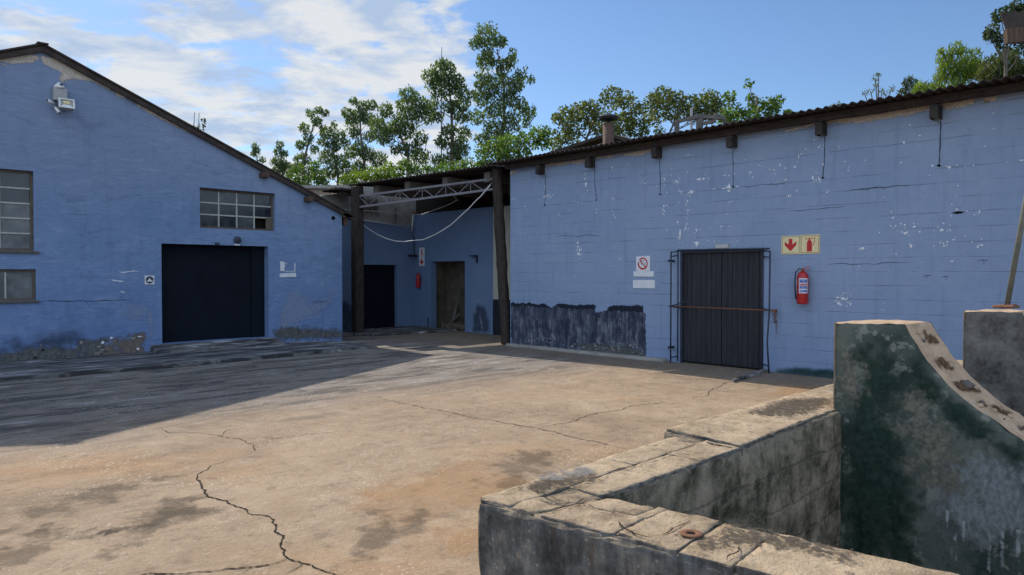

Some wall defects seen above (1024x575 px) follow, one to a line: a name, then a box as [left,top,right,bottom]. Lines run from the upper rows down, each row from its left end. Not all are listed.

peeling [0,54,190,133]
peeling [642,169,739,248]
crack [791,185,909,211]
peeling [879,185,980,248]
spalling [0,332,149,362]
crack [141,429,347,575]
crack [375,396,732,538]
leakage [689,349,1024,565]